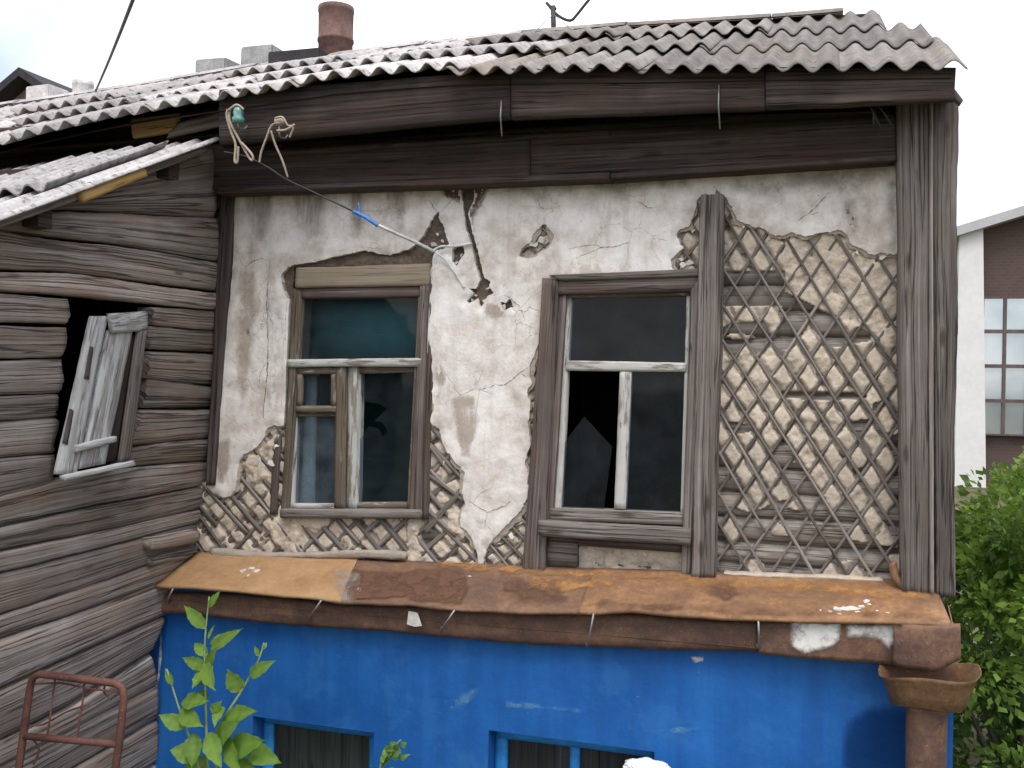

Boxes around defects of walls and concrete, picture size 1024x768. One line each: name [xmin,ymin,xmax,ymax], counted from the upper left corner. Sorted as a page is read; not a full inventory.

spalling [284,190,493,306]
spalling [522,225,550,257]
spalling [672,201,700,269]
crack [244,258,279,418]
spalling [717,202,899,577]
spalling [188,426,526,565]
rust [347,562,486,603]
rust [499,566,611,599]
spalling [547,545,682,570]
rust [765,582,921,597]